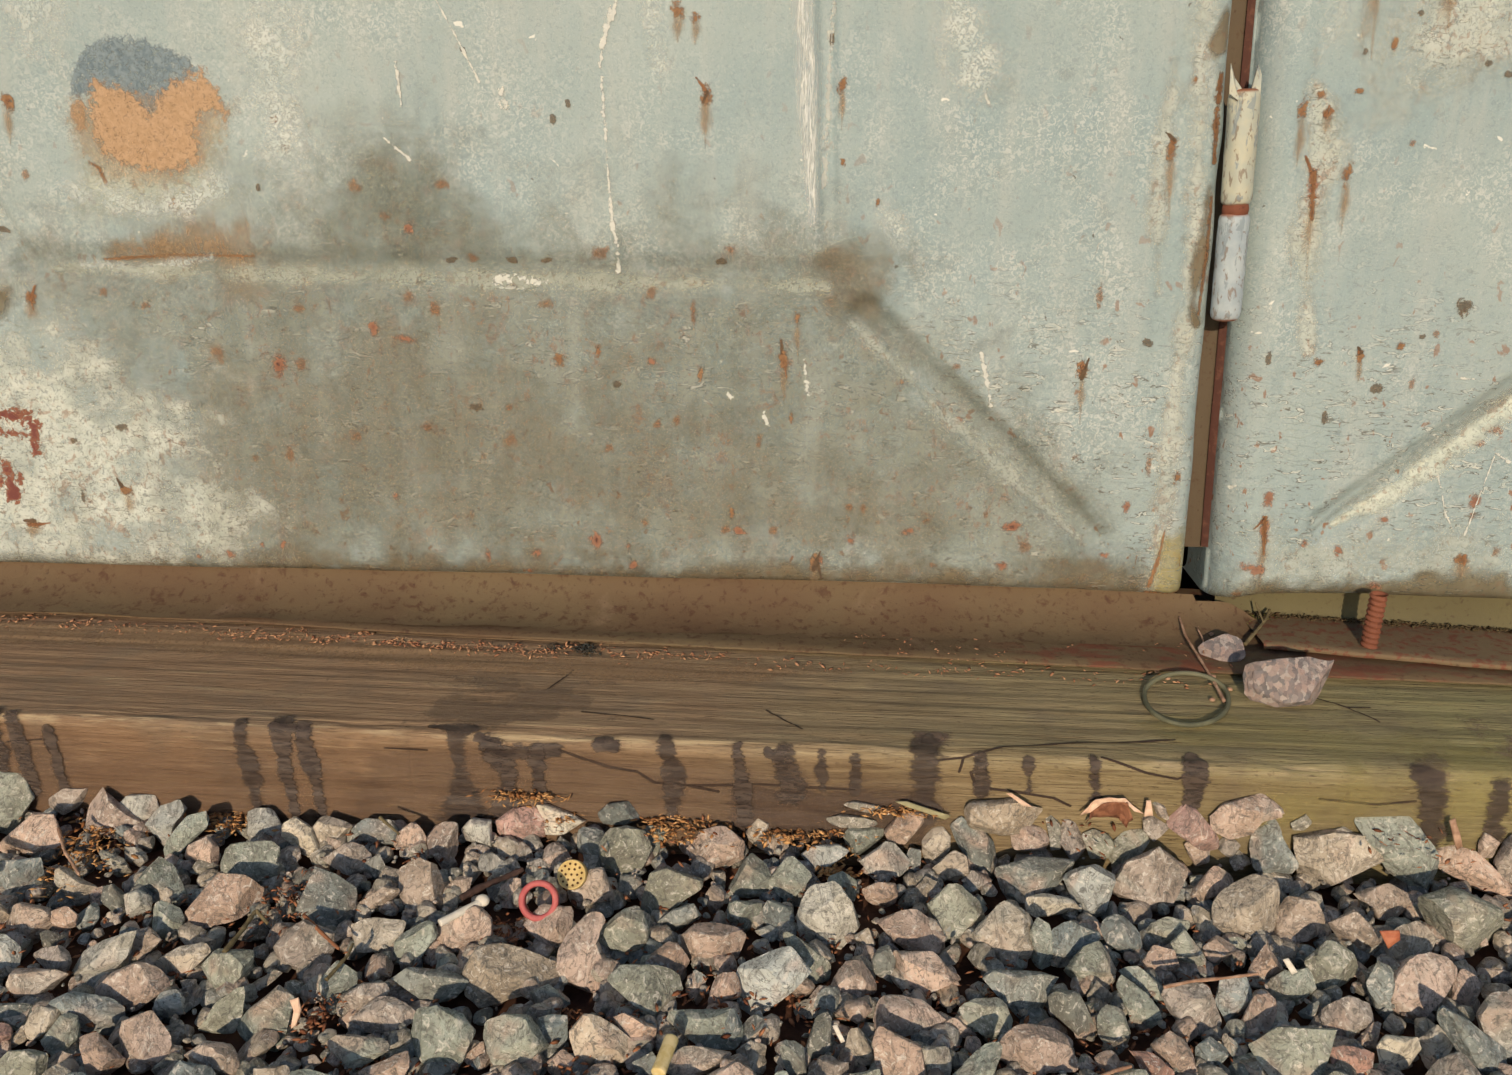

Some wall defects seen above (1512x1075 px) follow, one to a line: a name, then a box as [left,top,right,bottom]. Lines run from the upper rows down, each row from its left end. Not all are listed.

rust [670,1,700,24]
peeling [68,35,230,218]
rust [695,77,713,121]
rust [1166,132,1178,160]
rust [1212,72,1224,165]
rust [1300,138,1323,221]
rust [1297,90,1335,120]
rust [1190,192,1213,328]
leakage [9,155,1146,591]